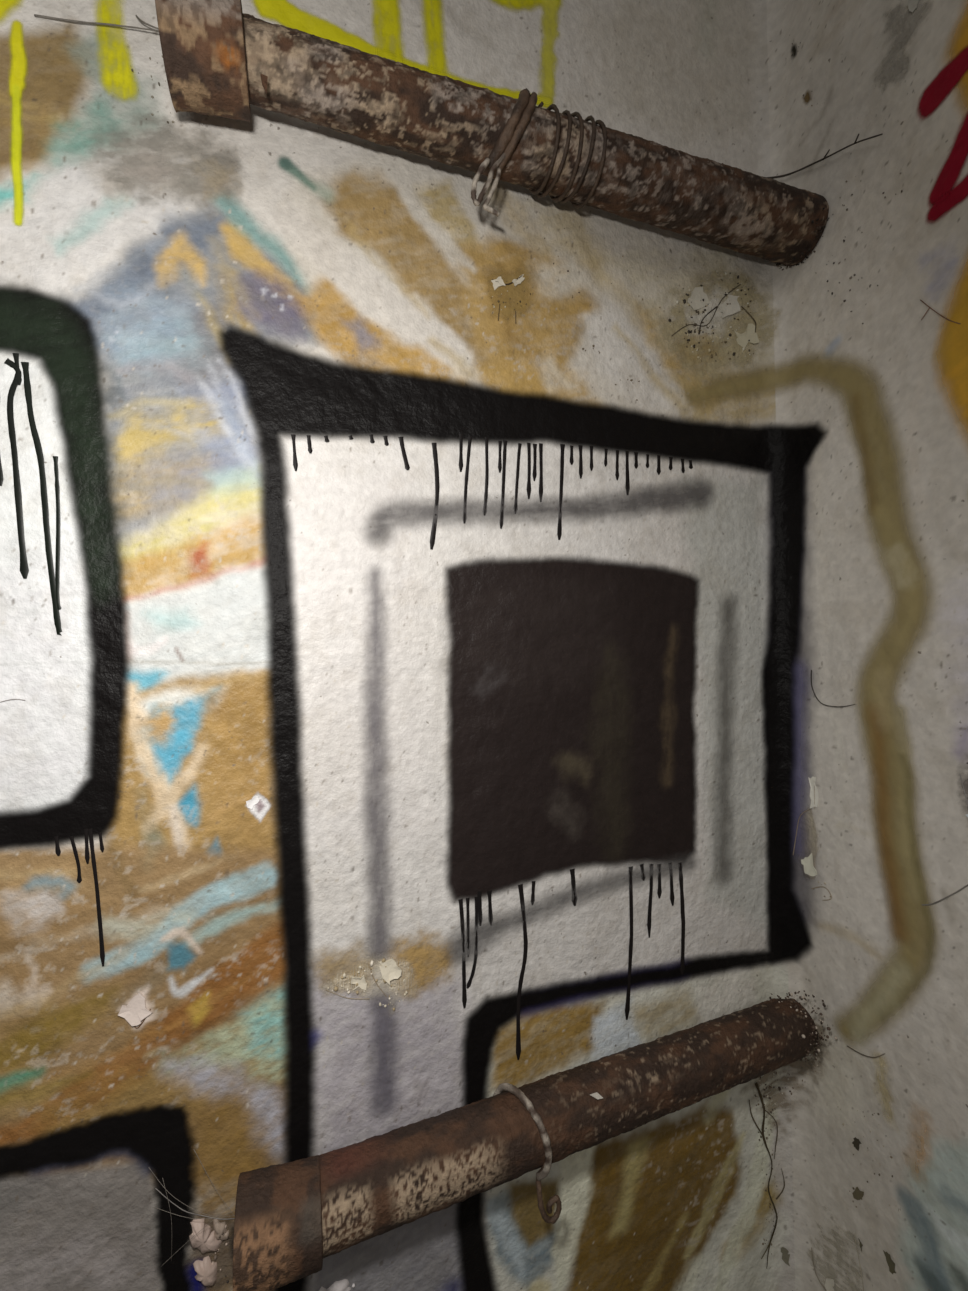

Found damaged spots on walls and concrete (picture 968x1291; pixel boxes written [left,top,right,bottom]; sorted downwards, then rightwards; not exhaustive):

flaking render [155,1188,235,1290]